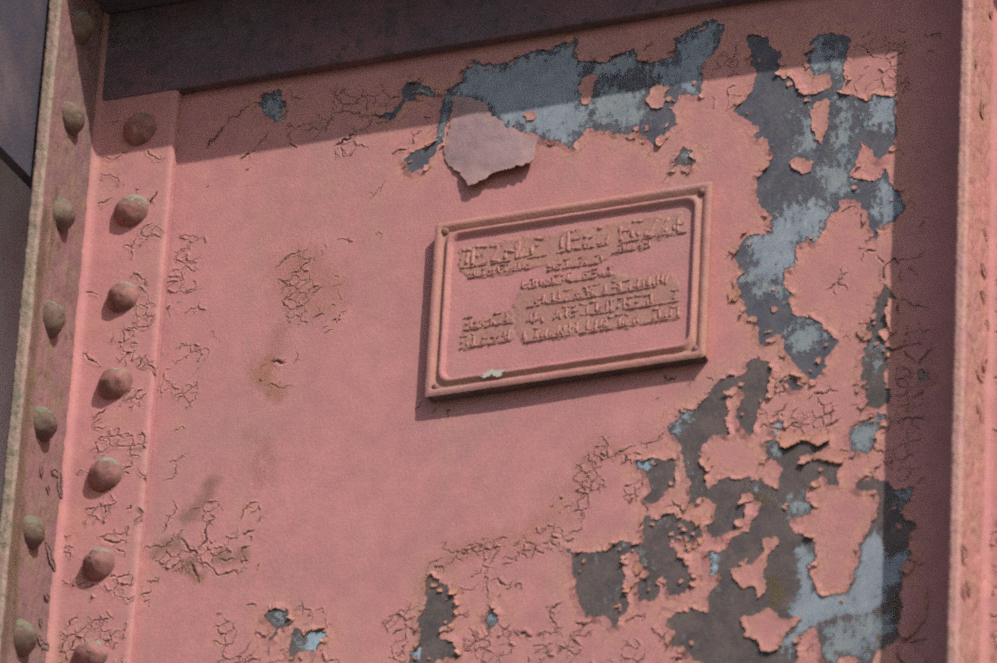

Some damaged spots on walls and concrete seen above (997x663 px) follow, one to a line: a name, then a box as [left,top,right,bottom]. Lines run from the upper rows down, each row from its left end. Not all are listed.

peeling [247,84,294,127]
peeling [367,14,730,185]
crack [275,231,384,335]
crack [38,146,266,663]
crack [258,351,301,397]
peeling [480,369,505,378]
peeling [560,28,925,663]
crack [426,431,688,663]
crack [212,599,342,663]
peeling [257,601,335,663]
crack [380,602,425,663]
peeling [403,570,468,663]